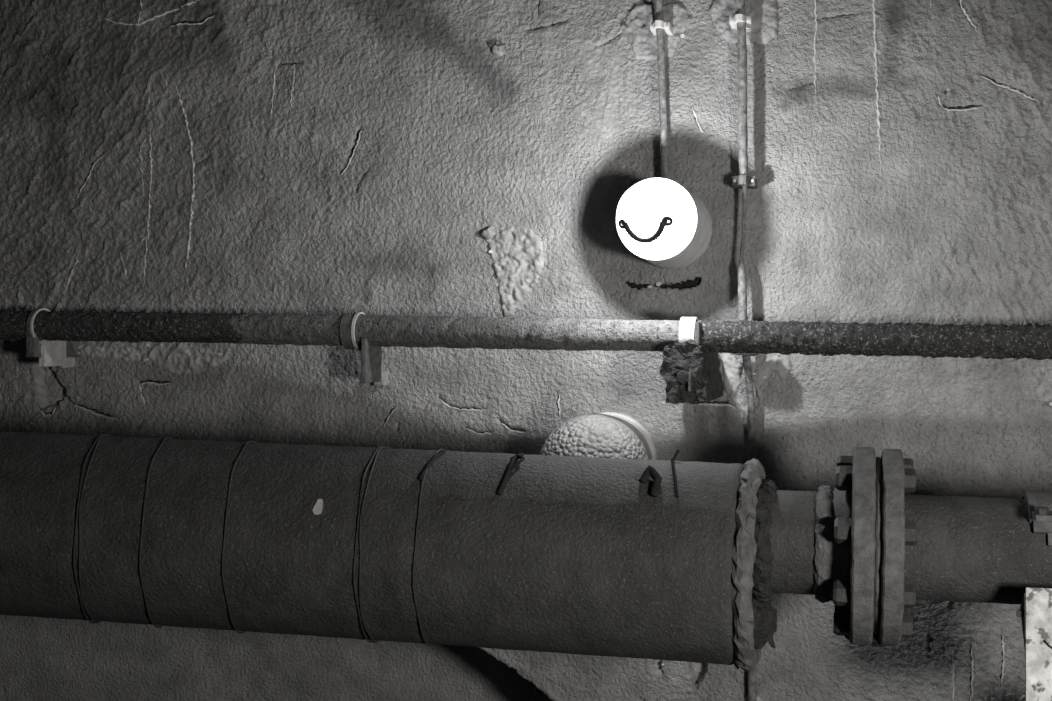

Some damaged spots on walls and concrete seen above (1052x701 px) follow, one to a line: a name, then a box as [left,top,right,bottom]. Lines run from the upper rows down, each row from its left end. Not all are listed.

crack [97,0,215,26]
crack [959,0,978,32]
crack [788,0,882,176]
crack [937,74,1039,111]
crack [120,128,153,284]
crack [148,79,214,282]
crack [341,129,369,192]
crack [63,248,81,294]
peeling [480,225,545,317]